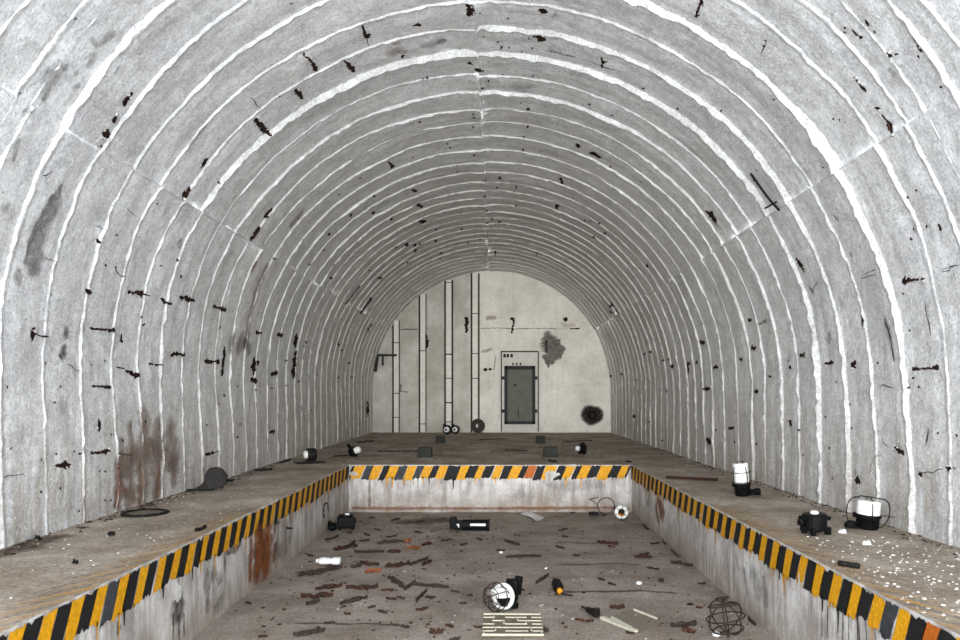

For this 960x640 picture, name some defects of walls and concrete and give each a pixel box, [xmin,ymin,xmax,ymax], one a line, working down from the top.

damp [541,332,565,368]
rust [249,523,277,583]